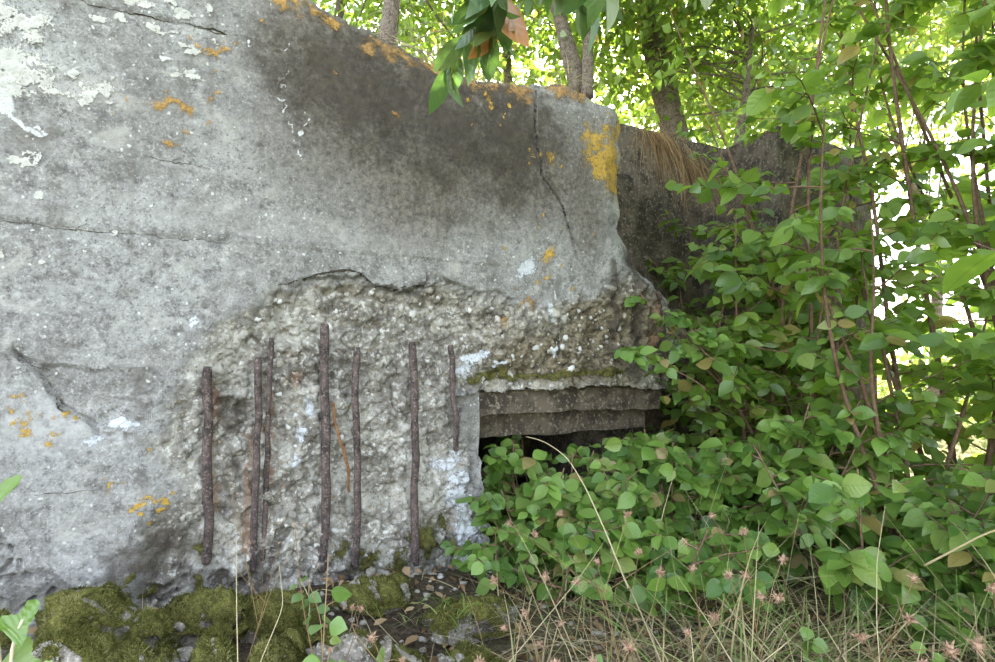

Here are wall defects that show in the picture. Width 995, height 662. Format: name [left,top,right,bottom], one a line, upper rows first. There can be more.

crack [82,0,227,35]
peeling [516,256,537,278]
crack [525,99,581,237]
crack [29,364,99,430]
corrosion [201,366,214,565]
corrosion [249,337,274,573]
corrosion [318,324,362,573]
spalling [14,266,677,610]